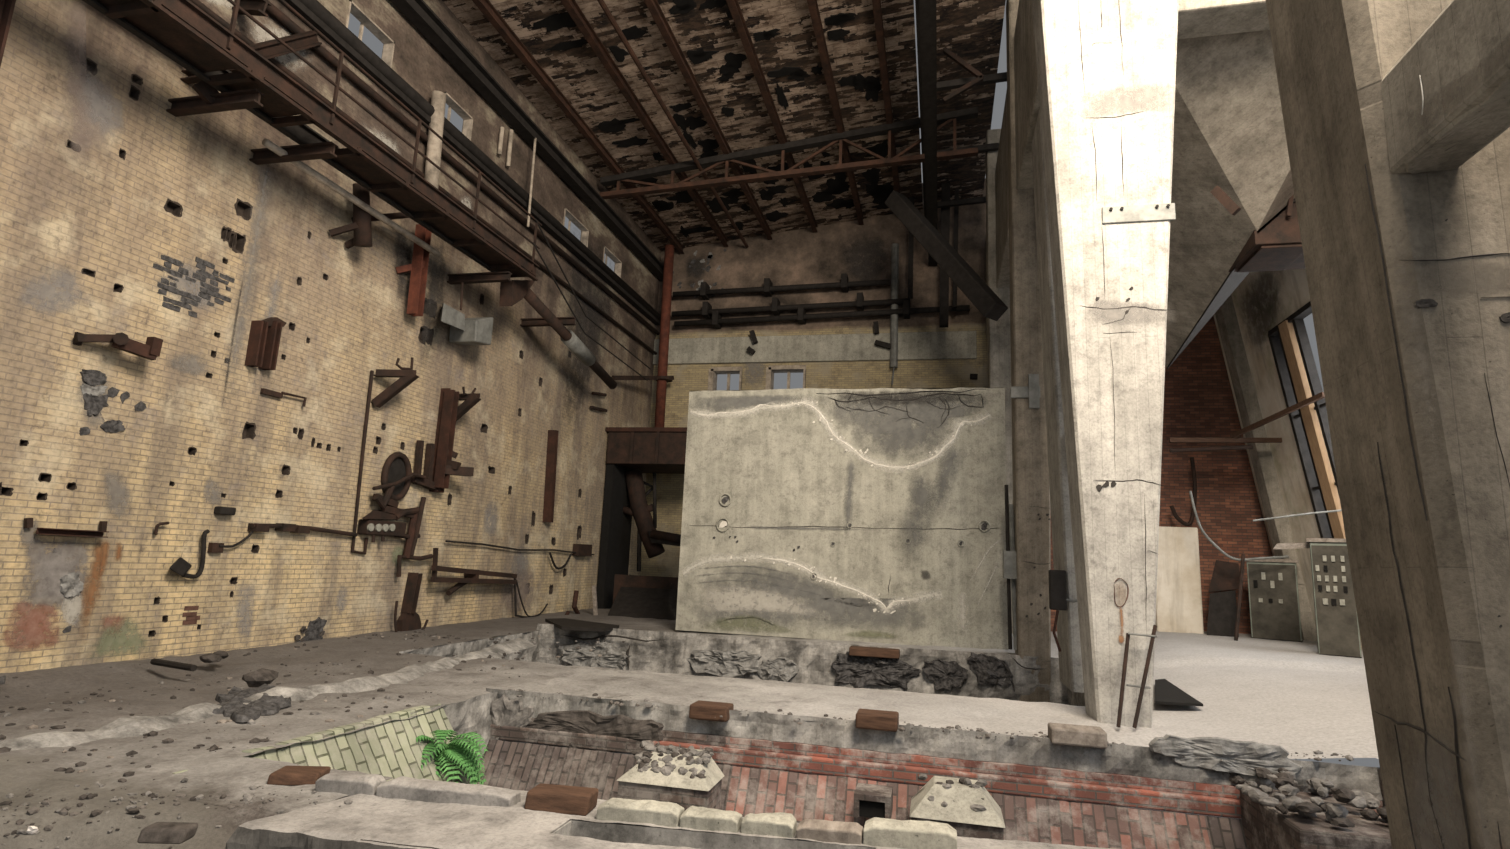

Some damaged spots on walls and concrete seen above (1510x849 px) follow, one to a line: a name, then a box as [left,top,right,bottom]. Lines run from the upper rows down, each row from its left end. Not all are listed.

spalling [153,198,253,318]
spalling [79,369,147,436]
spalling [205,332,229,378]
leakage [690,363,992,546]
crack [1364,164,1510,849]
spalling [399,624,1085,706]